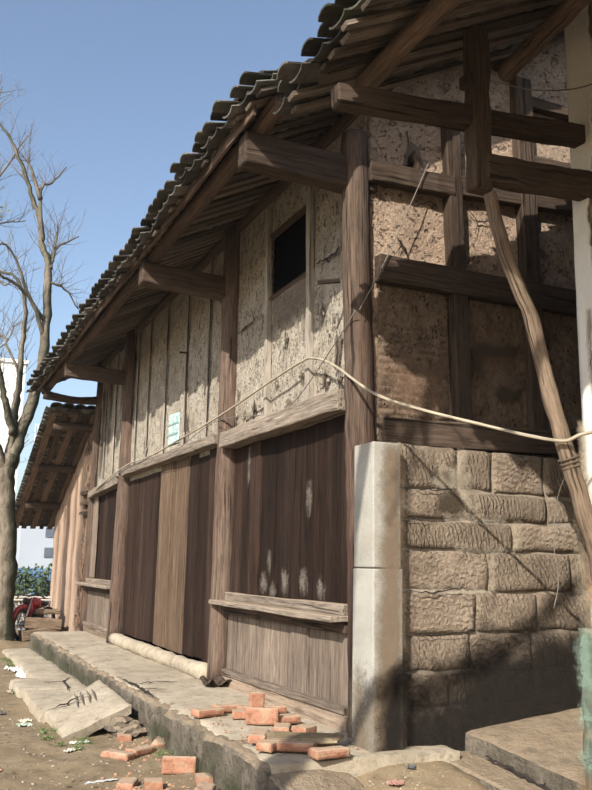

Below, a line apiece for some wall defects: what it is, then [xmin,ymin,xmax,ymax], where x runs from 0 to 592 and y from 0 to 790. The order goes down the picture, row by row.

crack [43,677,78,710]
crack [116,676,170,698]